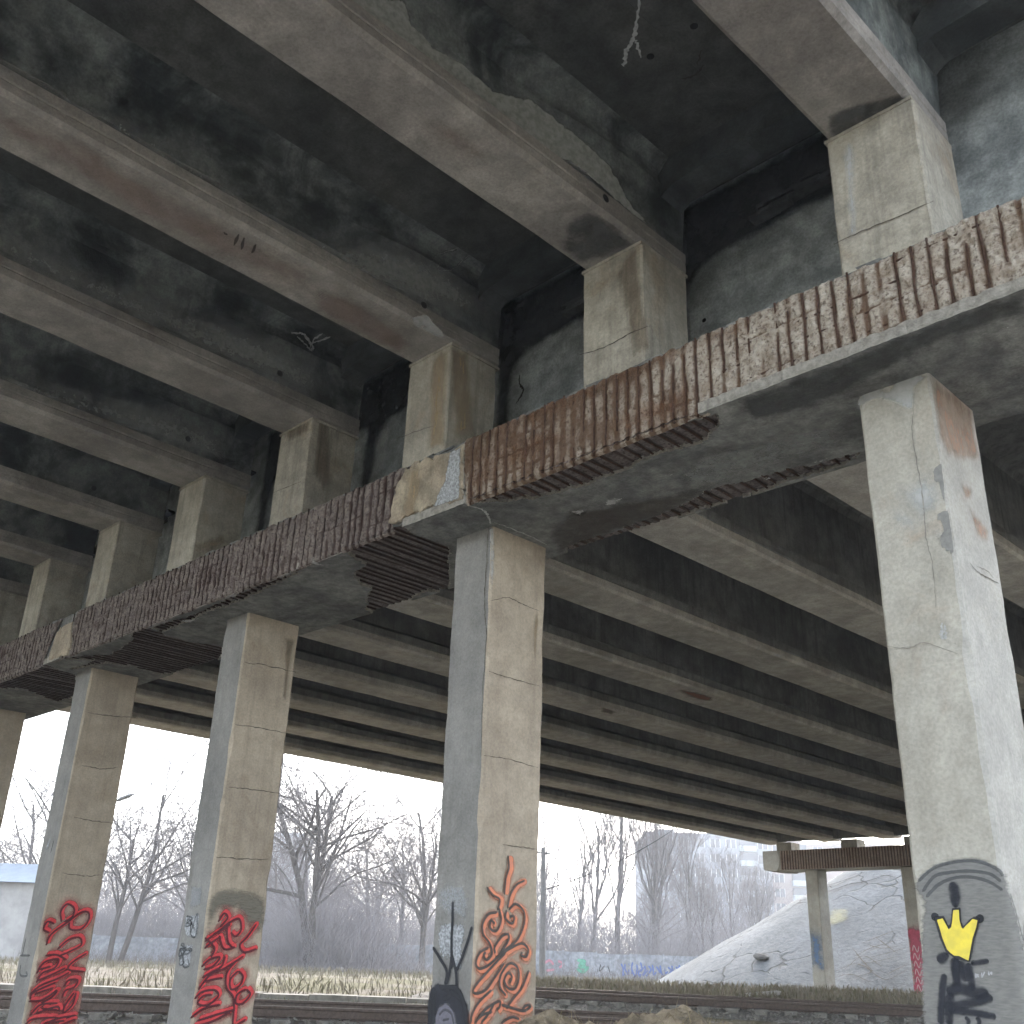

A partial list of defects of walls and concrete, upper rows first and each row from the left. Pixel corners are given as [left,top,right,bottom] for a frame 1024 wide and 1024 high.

crack [621,0,641,67]
leakage [565,216,647,347]
spalling [435,196,1024,506]
spalling [0,466,450,701]
crack [470,506,547,768]
spalling [568,454,855,549]
crack [911,387,936,598]
peeling [933,464,953,554]